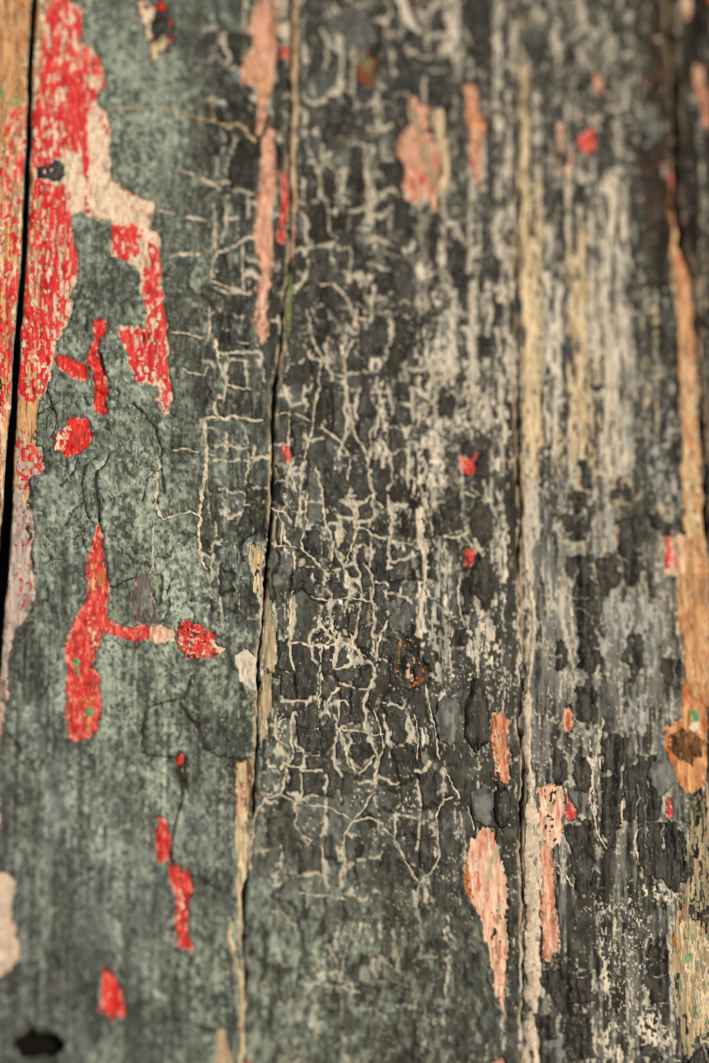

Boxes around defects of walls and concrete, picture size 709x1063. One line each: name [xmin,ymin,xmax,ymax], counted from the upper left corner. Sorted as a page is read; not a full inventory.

crack [114,94,258,142]
peeling [0,0,175,735]
crack [109,104,475,908]
peeling [235,0,709,1063]
peeling [64,525,226,743]
crack [562,576,575,666]
crack [565,718,642,868]
peeling [0,872,21,977]
peeling [155,817,194,954]
peeling [216,759,252,1063]
crack [300,938,362,1020]
crack [540,857,574,888]